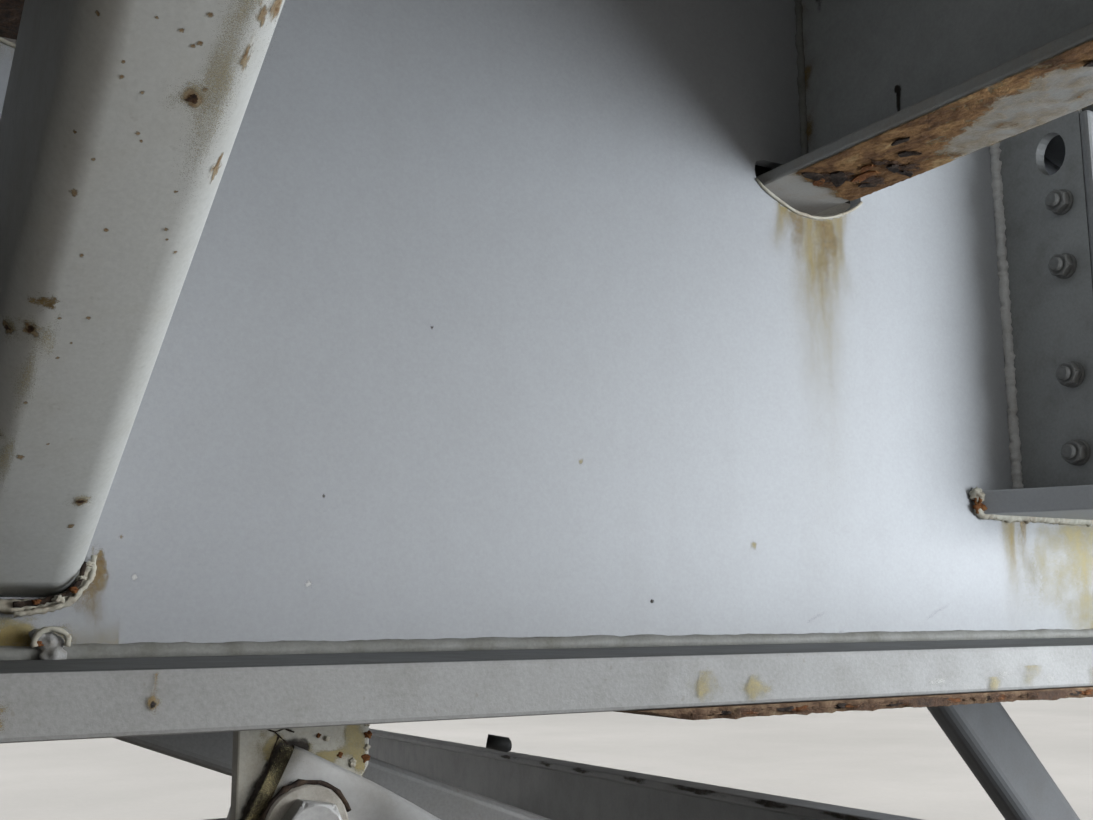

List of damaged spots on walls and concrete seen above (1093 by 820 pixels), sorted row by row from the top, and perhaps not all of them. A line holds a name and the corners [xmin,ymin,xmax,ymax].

rust [0,0,25,40]
rust [257,0,283,27]
rust [240,44,251,70]
rust [166,80,220,115]
rust [795,31,1093,201]
rust [2,292,61,341]
rust [66,494,92,508]
rust [997,521,1034,626]
rust [54,546,120,644]
rust [0,621,44,647]
rust [687,665,1093,720]